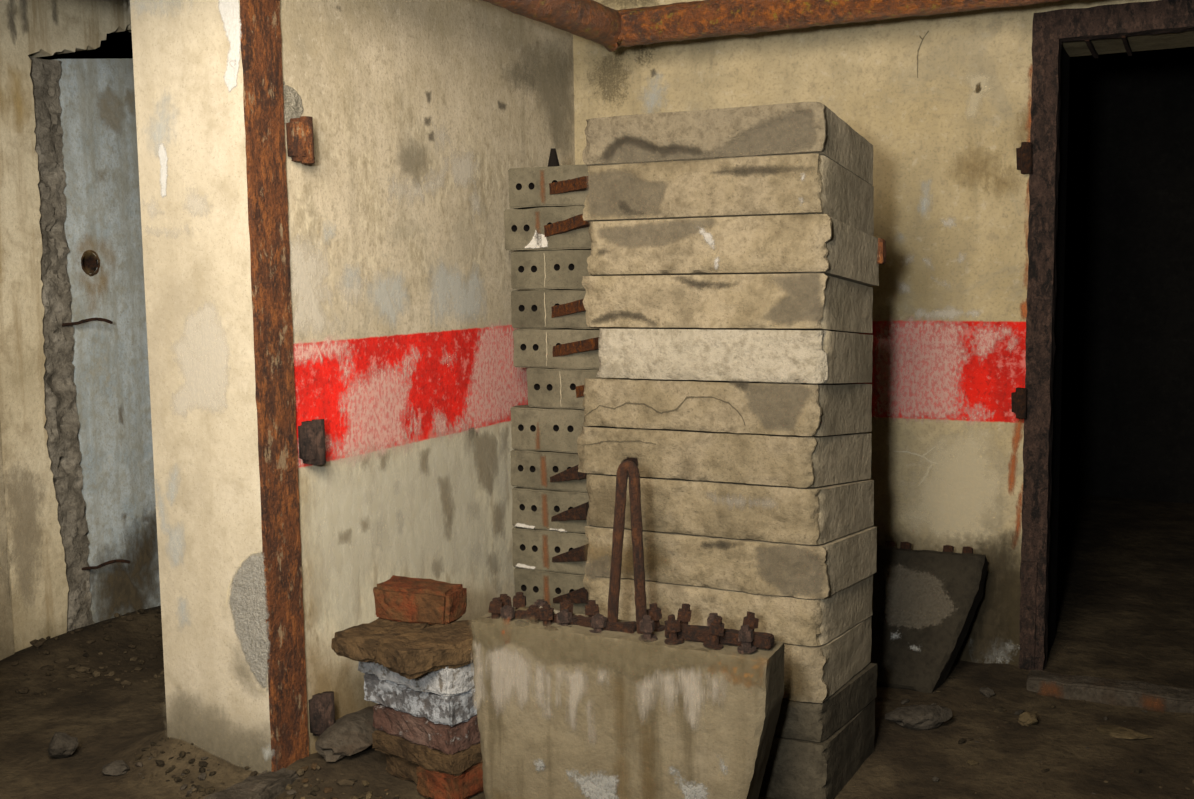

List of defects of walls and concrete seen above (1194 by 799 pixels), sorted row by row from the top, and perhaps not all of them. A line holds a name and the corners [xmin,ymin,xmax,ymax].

spalling [29,56,133,632]
corrosion [1009,420,1023,546]
flaking render [230,553,270,687]
water stain [472,620,761,737]
water stain [567,771,619,799]
water stain [670,767,708,799]